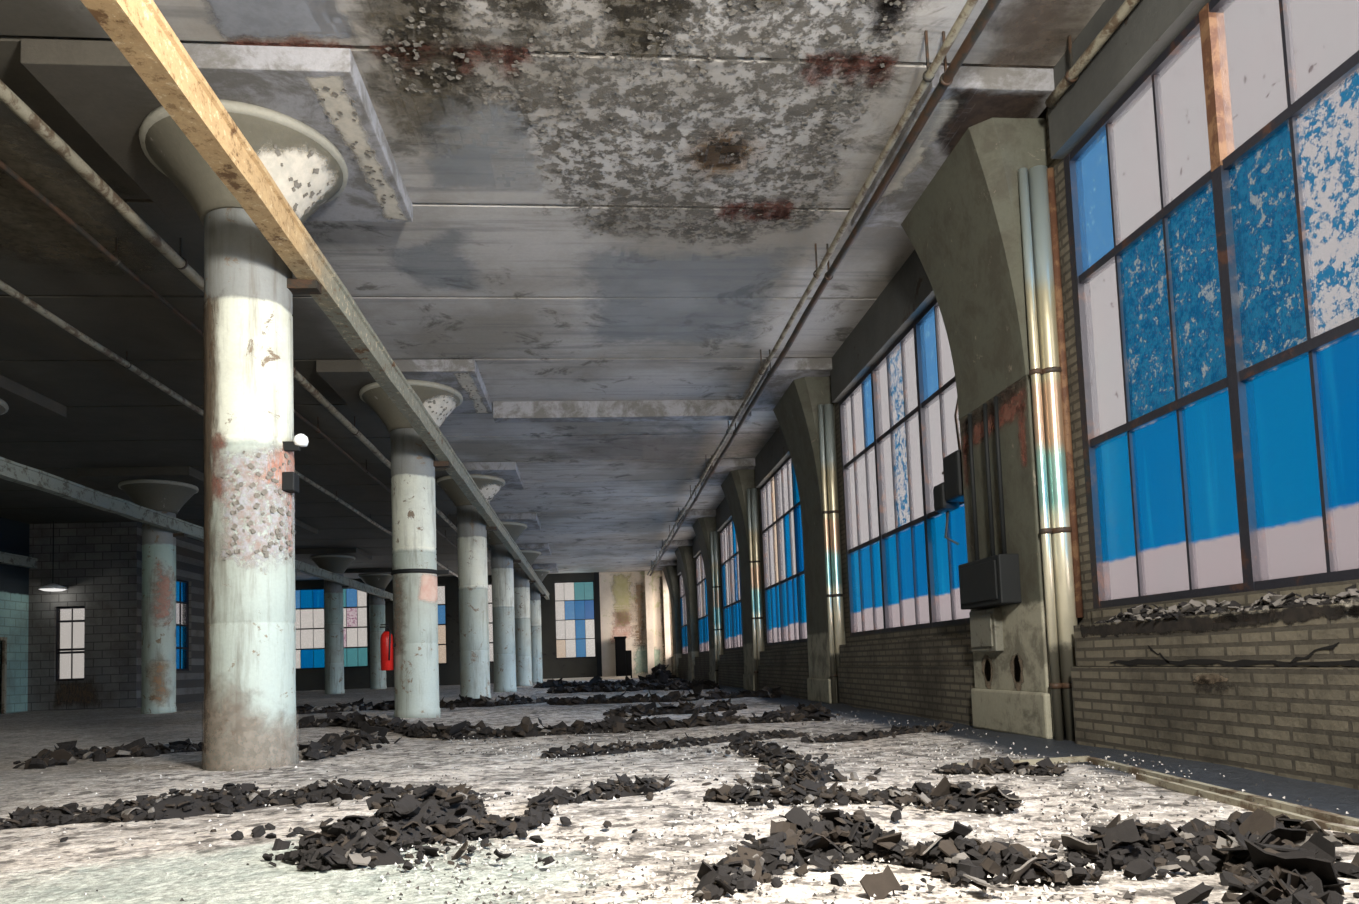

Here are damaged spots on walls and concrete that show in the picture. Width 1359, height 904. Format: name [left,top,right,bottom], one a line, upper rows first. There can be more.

water stain [356,0,473,143]
rust [372,41,530,77]
water stain [602,0,698,59]
rust [802,52,897,88]
water stain [873,0,907,35]
peeling [258,144,334,218]
peeling [307,76,406,220]
peeling [377,0,909,245]
water stain [688,129,755,176]
rust [718,200,796,221]
rust [263,450,294,550]
crack [1110,642,1359,667]